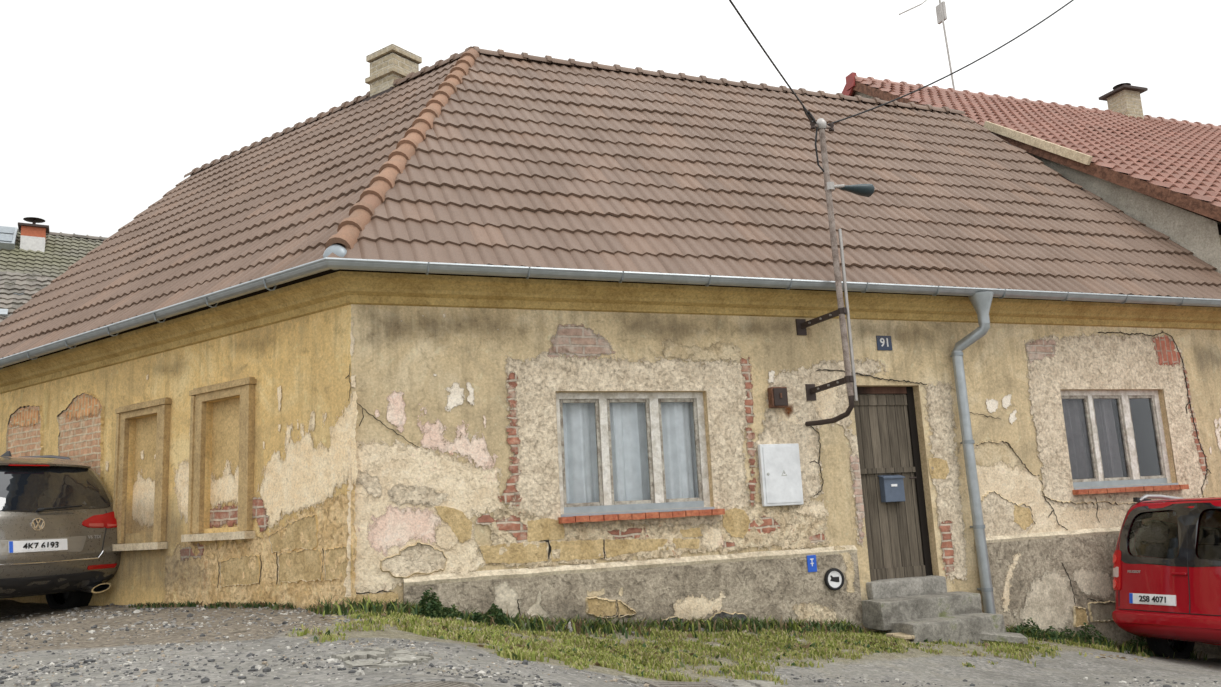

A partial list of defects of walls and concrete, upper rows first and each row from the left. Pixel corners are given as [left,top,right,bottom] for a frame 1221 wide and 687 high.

flaking render [547,323,616,361]
flaking render [1024,338,1056,363]
flaking render [6,392,109,480]
peeling [132,451,156,528]
crack [345,366,418,447]
flaking render [164,338,855,619]
flaking render [849,454,865,543]
crack [1098,331,1211,497]
flaking render [1152,335,1221,475]